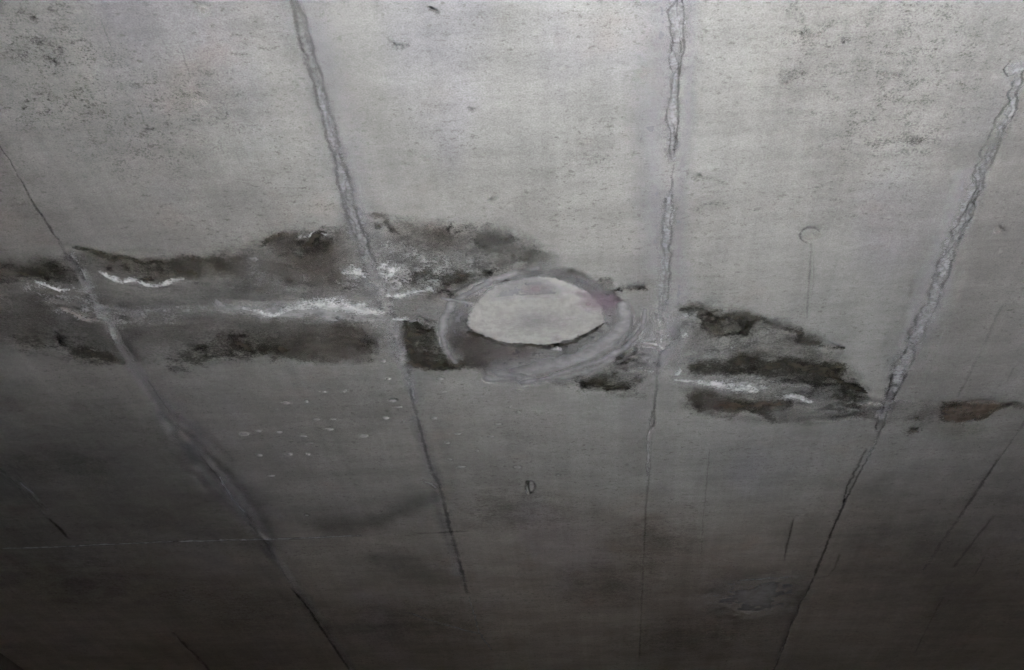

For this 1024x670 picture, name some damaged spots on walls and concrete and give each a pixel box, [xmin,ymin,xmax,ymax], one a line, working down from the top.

crack [665,0,686,162]
crack [0,147,42,215]
crack [70,251,118,343]
leakage [0,212,541,385]
crack [291,0,417,402]
crack [653,191,679,339]
leakage [551,303,867,422]
crack [878,61,1024,418]
rust [940,401,1021,423]